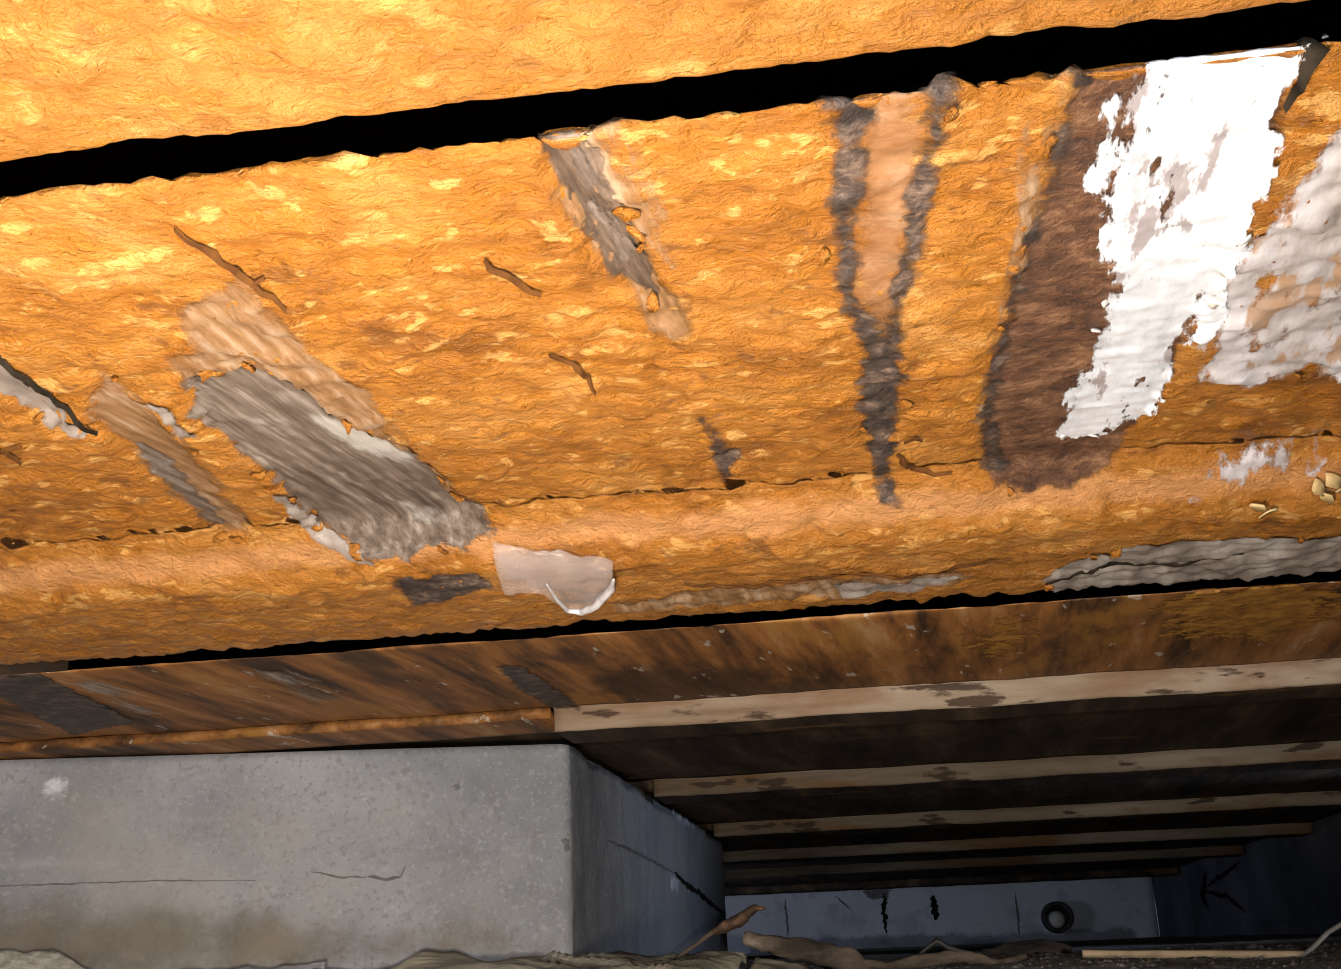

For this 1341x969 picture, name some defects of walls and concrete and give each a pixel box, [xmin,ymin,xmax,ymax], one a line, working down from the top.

peeling [541,121,689,339]
peeling [1056,36,1341,440]
water stain [819,72,959,508]
peeling [0,281,497,605]
peeling [1248,503,1279,519]
peeling [1208,431,1321,486]
peeling [1308,461,1341,504]
peeling [501,555,1012,616]
peeling [1042,536,1341,593]
crack [0,879,256,887]
crack [608,841,723,913]